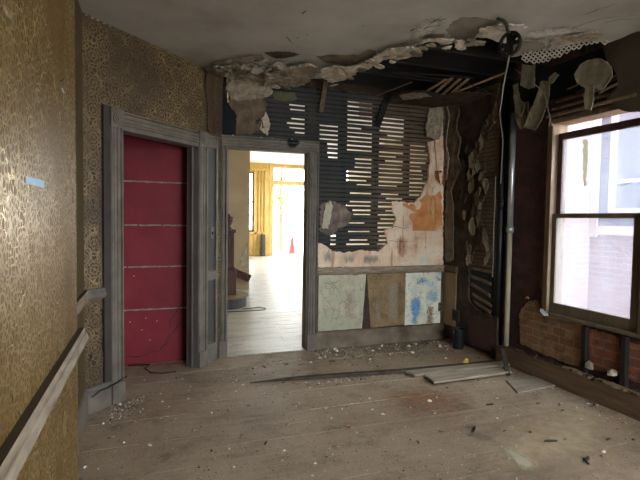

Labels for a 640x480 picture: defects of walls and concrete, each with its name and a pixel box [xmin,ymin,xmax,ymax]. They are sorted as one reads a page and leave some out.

peeling [317,17,499,69]
flaking render [511,48,637,119]
spalling [204,51,501,352]
spalling [519,300,640,396]